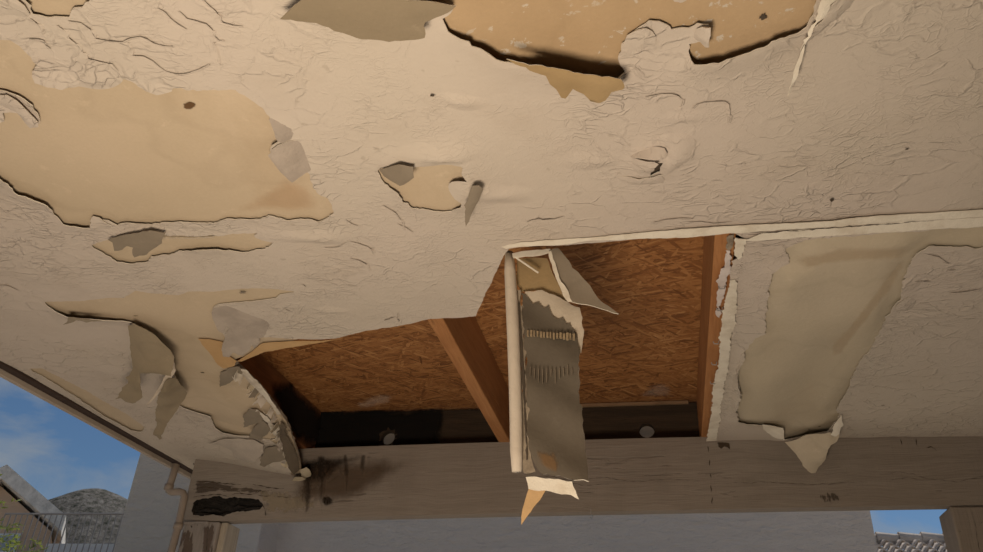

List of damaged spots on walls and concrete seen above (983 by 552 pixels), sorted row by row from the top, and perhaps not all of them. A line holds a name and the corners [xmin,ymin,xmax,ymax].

peeling [0,0,89,17]
crack [29,0,243,75]
peeling [280,0,854,103]
peeling [0,40,334,264]
peeling [378,164,483,225]
peeling [619,133,696,185]
peeling [45,288,332,481]
peeling [706,227,983,473]
leakage [273,383,442,505]
peeling [526,477,579,499]